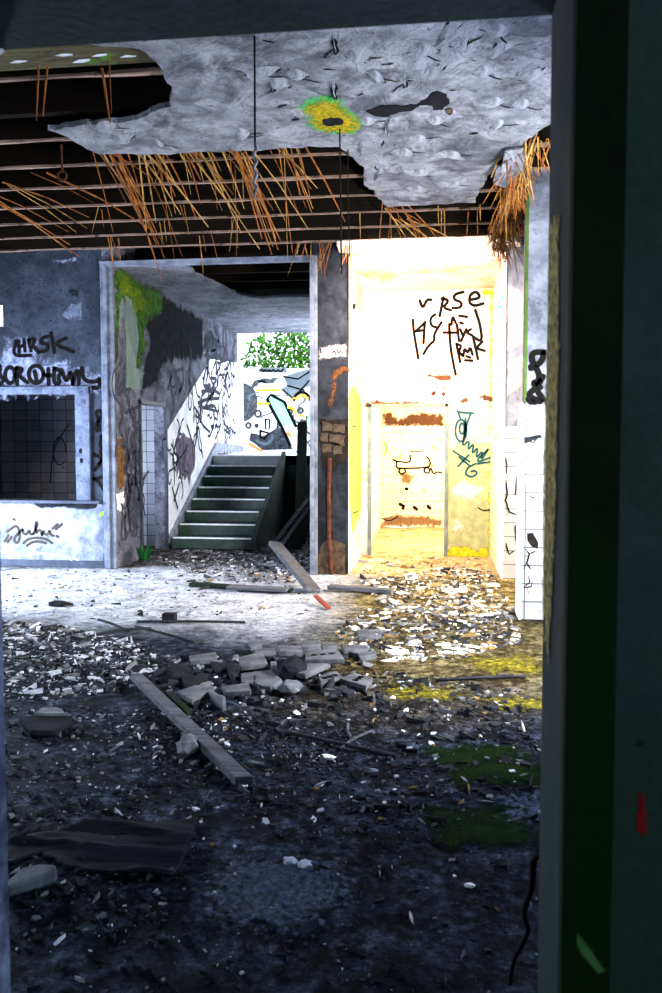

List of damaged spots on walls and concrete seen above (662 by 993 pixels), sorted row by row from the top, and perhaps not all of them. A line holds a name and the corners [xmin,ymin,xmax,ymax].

damp [299,96,362,134]
flaking render [366,91,453,117]
damp [115,293,123,356]
corrosion [328,366,350,407]
flaking render [318,418,348,575]
crack [32,548,77,560]